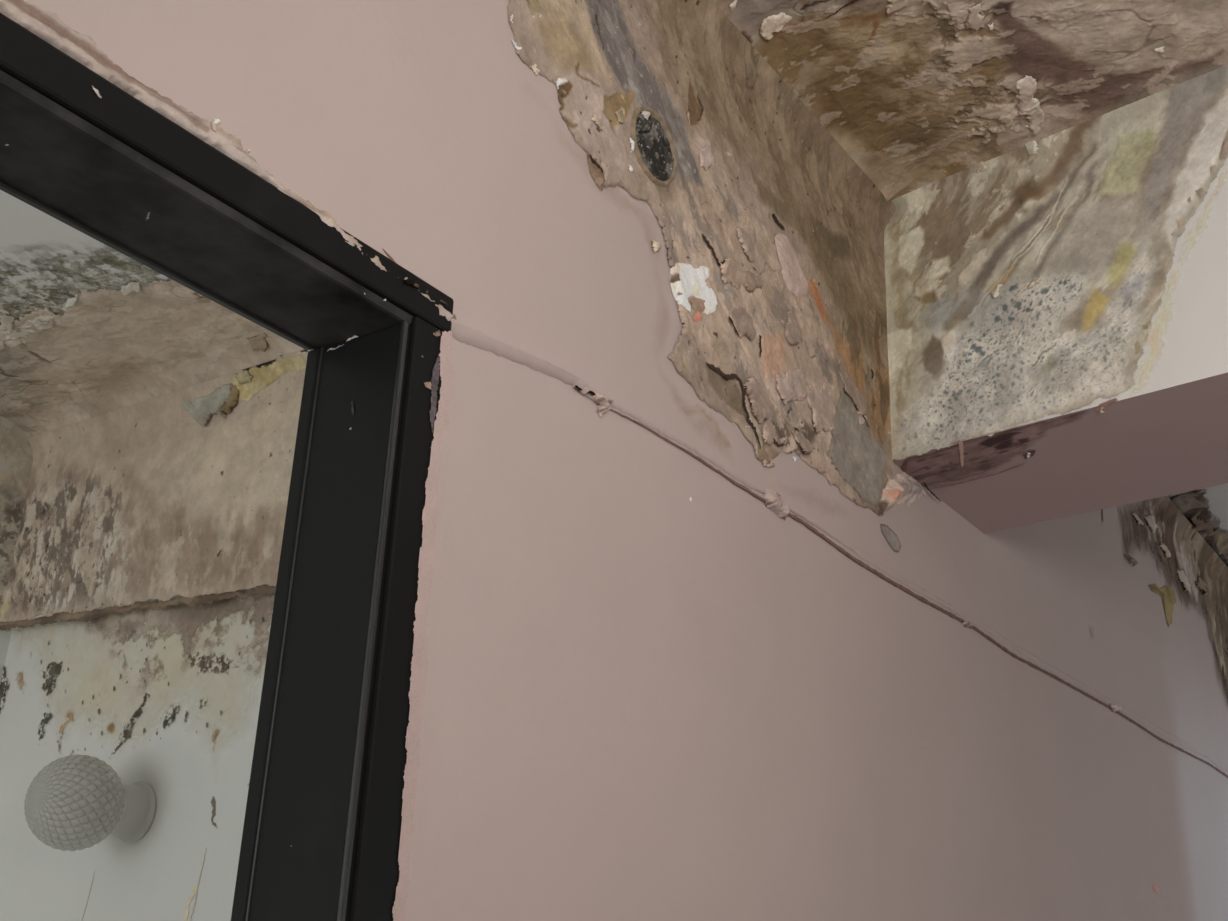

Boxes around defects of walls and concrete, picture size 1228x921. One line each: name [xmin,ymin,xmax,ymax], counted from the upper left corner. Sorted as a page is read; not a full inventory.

water stain [0,249,172,325]
flaking render [0,584,276,632]
flaking render [0,280,306,438]
water stain [0,350,311,754]
crack [450,317,1228,777]
flaking render [508,0,1228,553]
water stain [884,65,1228,489]